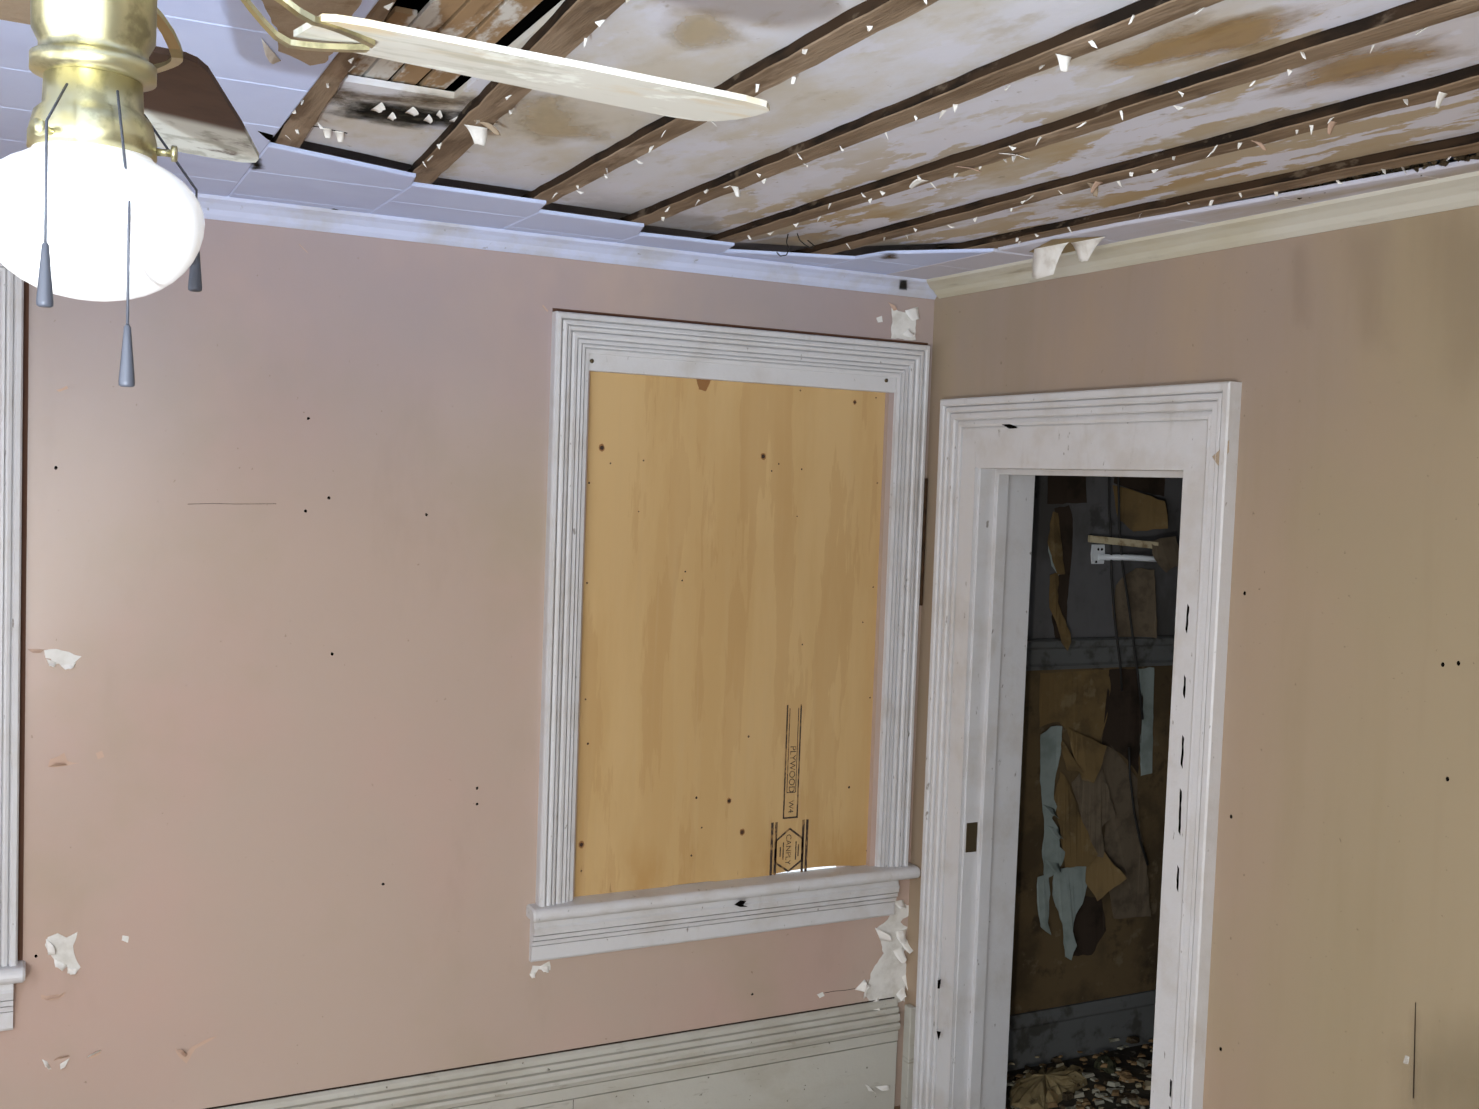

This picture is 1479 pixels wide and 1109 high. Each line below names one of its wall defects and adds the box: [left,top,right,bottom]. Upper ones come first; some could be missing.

damp [1110,15,1283,68]
damp [1296,43,1438,89]
peeling [1030,236,1106,279]
peeling [28,649,81,670]
peeling [45,932,81,975]
peeling [855,900,913,1011]